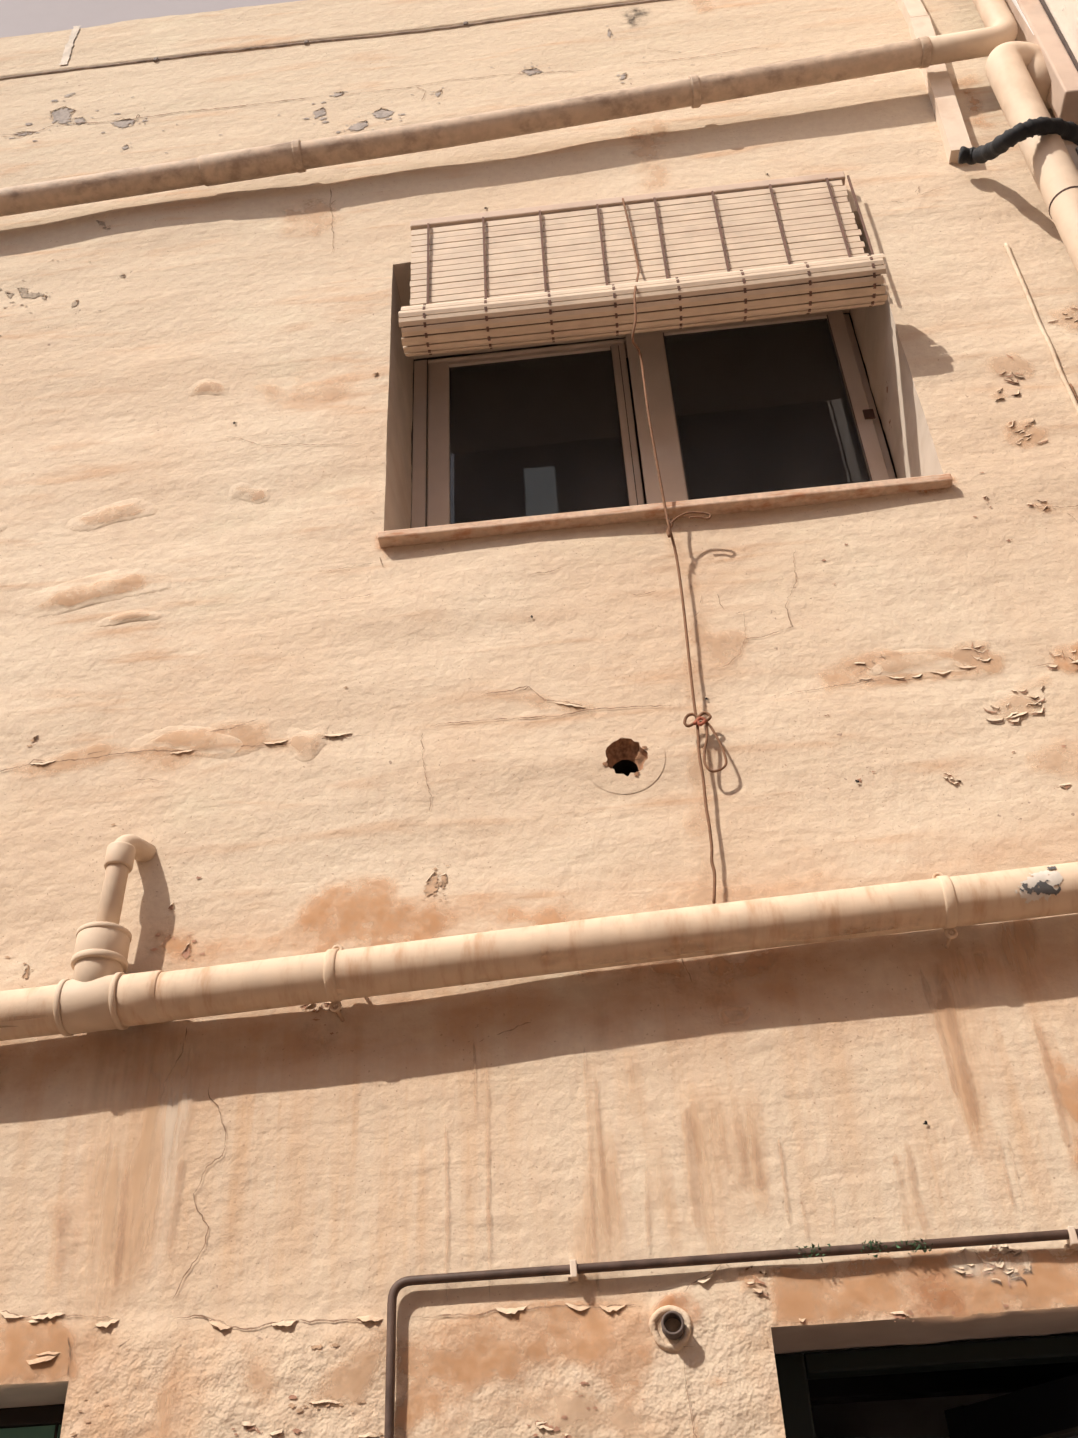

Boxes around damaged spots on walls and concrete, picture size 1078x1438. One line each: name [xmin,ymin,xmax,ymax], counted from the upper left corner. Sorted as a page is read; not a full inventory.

peeling [9,92,148,152]
crack [695,552,797,667]
crack [2,720,352,780]
peeling [421,865,450,908]
crack [175,1092,383,1330]
crack [439,1302,632,1316]
peeling [886,1310,914,1322]